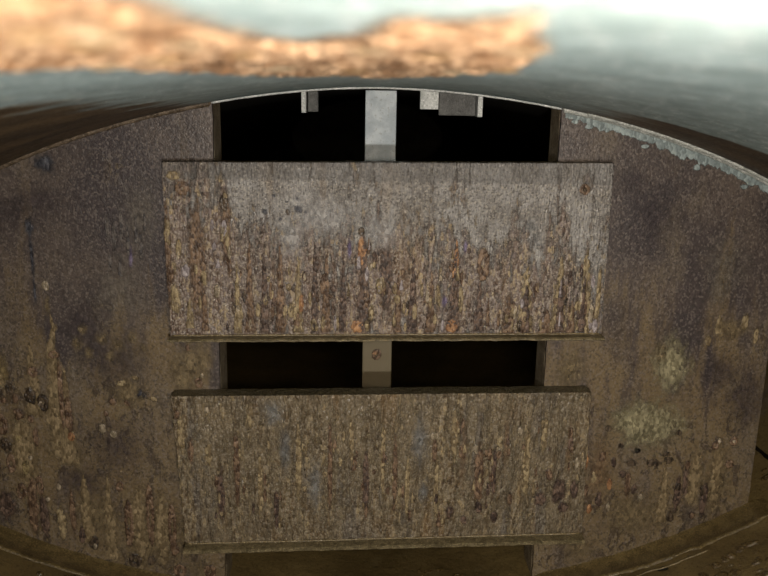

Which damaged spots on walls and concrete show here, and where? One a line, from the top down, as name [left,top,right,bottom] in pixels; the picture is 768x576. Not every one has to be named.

peeling [565,113,768,193]
rust [212,193,602,333]
water stain [657,340,686,388]
rust [0,302,186,576]
rust [323,419,413,522]
rust [450,410,551,509]
water stain [605,405,684,453]
rust [647,436,738,523]